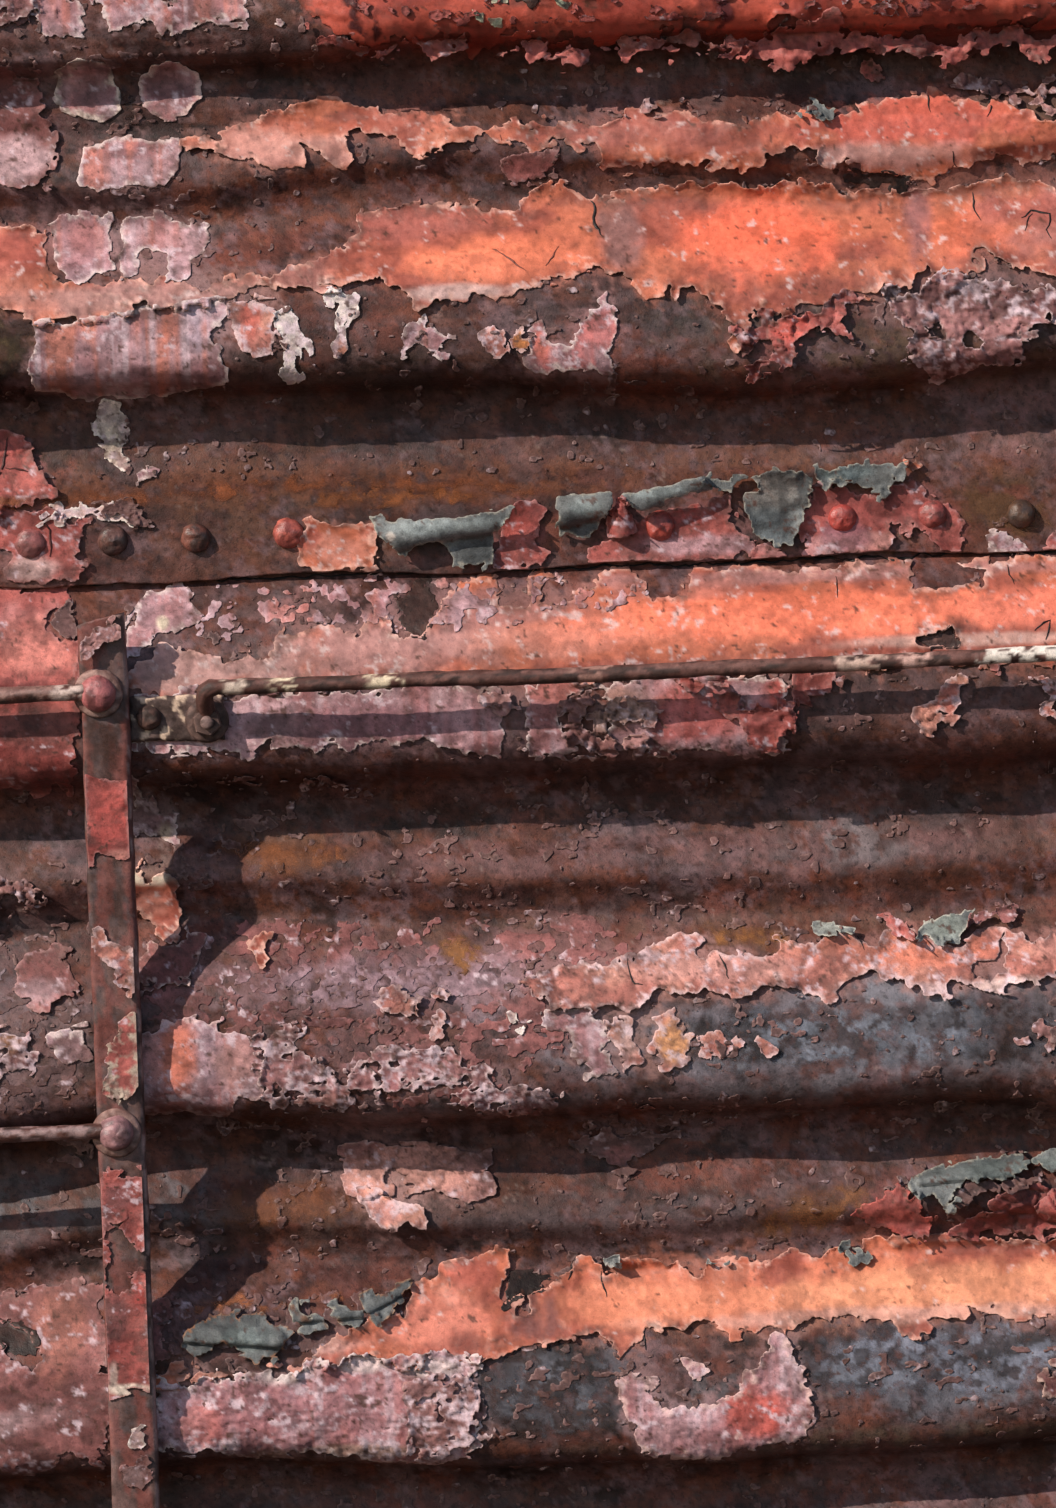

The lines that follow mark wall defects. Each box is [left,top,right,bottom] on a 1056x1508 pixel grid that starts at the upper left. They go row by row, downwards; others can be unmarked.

corrosion [286,477,532,506]
peeling [0,777,1056,1490]
corrosion [227,1180,326,1226]
corrosion [761,1186,864,1234]
corrosion [195,1294,267,1314]